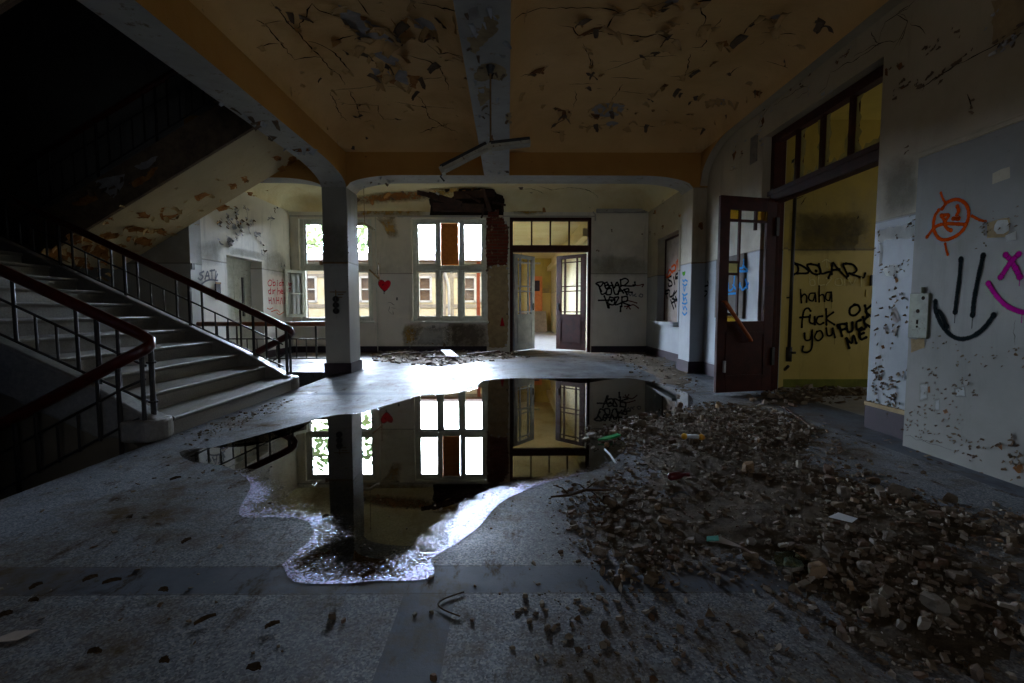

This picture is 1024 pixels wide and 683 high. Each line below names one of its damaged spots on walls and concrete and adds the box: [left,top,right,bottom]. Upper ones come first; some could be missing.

crack [257,0,467,133]
peeling [330,5,441,113]
crack [513,2,724,105]
peeling [541,81,762,143]
peeling [41,176,278,281]
peeling [484,217,509,348]
peeling [854,215,1024,481]